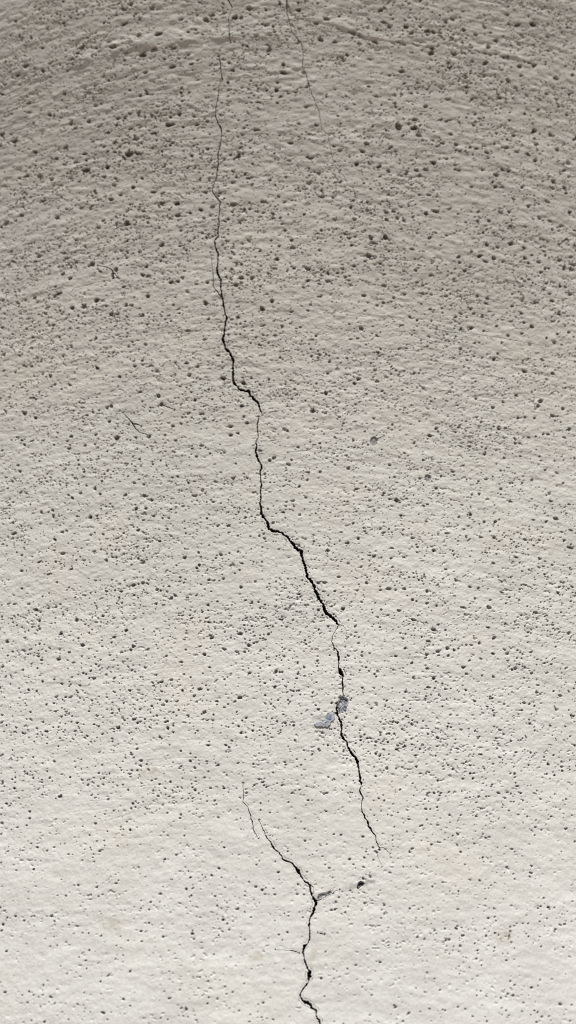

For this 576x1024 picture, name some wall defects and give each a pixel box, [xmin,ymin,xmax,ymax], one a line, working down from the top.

crack [209,0,404,867]
crack [241,783,340,1024]